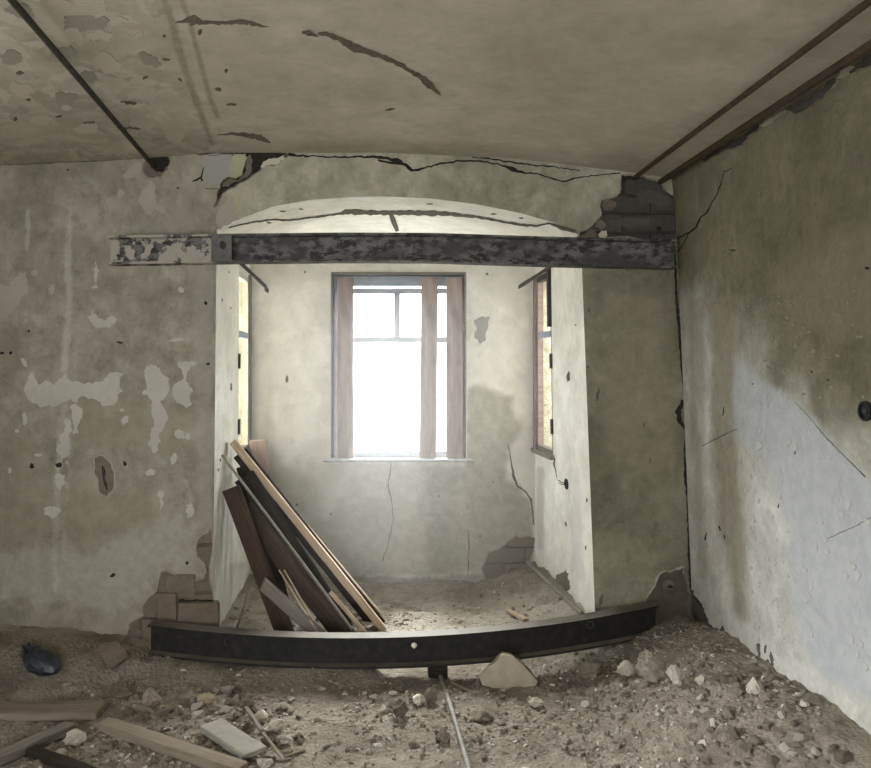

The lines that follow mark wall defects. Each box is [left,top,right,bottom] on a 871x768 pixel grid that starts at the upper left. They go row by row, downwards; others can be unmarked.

crack [302,30,441,96]
crack [229,209,576,233]
crack [192,132,620,208]
flaking render [577,173,677,243]
peeling [0,351,129,490]
peeling [142,361,210,454]
crack [674,168,737,592]
damp [561,192,871,630]
crack [508,445,535,525]
flaking render [126,530,220,639]
flaking render [481,535,535,580]
flaking render [646,566,724,631]